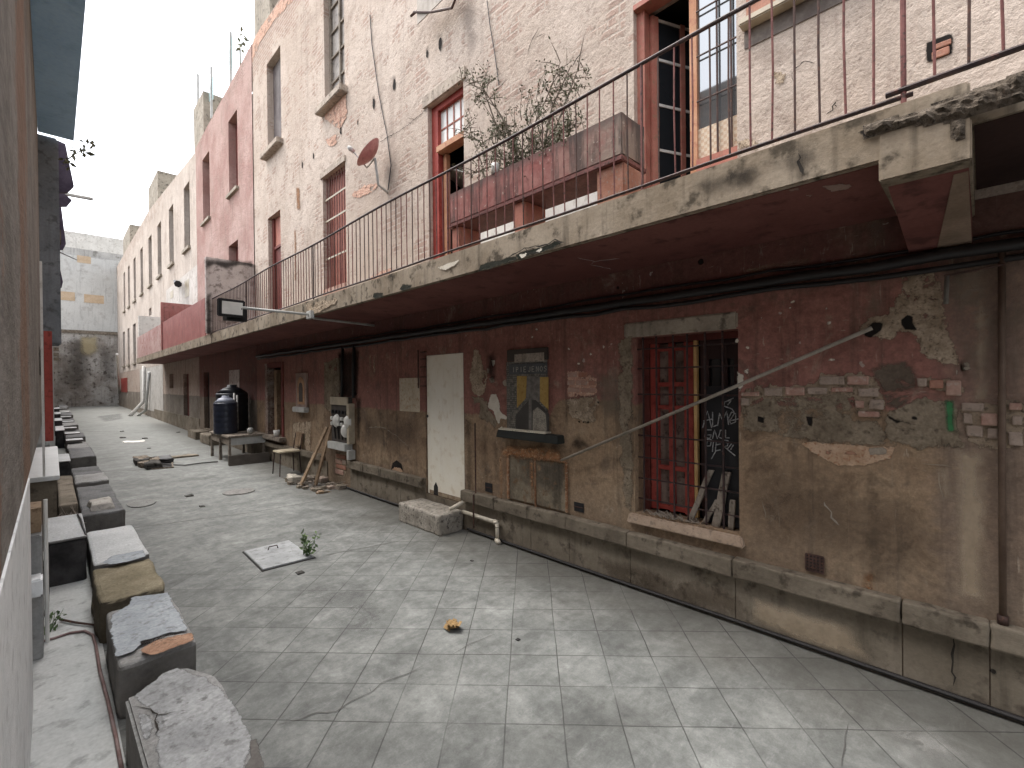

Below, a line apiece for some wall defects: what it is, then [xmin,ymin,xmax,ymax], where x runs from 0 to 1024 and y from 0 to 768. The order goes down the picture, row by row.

flaking render [324,94,358,147]
spalling [858,71,1024,141]
flaking render [469,349,507,428]
flaking render [566,363,600,423]
flaking render [737,273,1024,466]
crack [949,639,957,685]